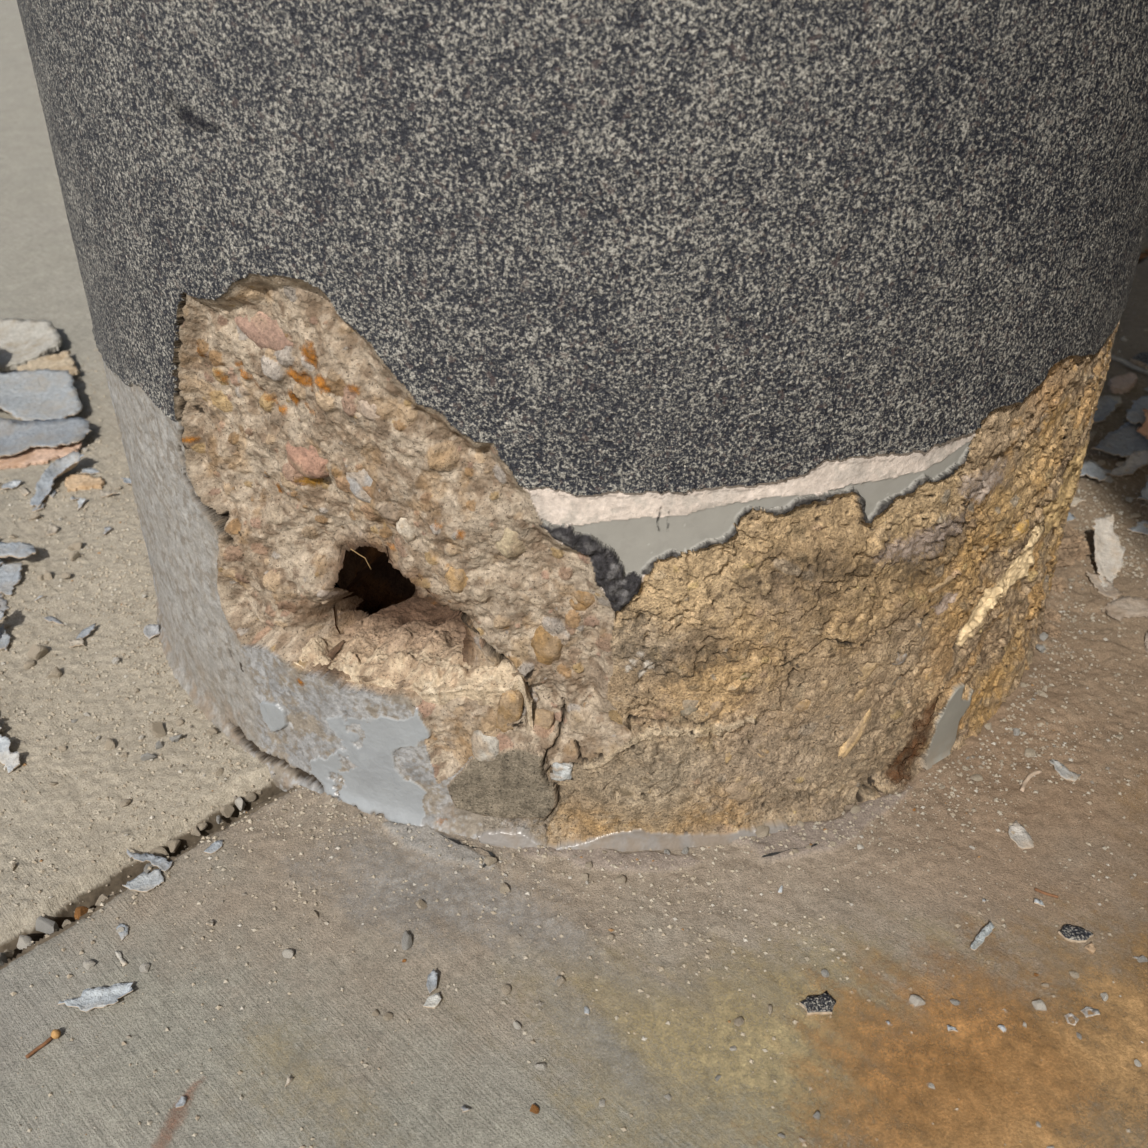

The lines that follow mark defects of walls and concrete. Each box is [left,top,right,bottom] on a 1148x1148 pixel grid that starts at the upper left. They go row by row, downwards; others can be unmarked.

peeling [143,624,160,640]
spalling [172,273,1148,854]
crack [543,700,604,832]
rust [827,957,1148,1148]